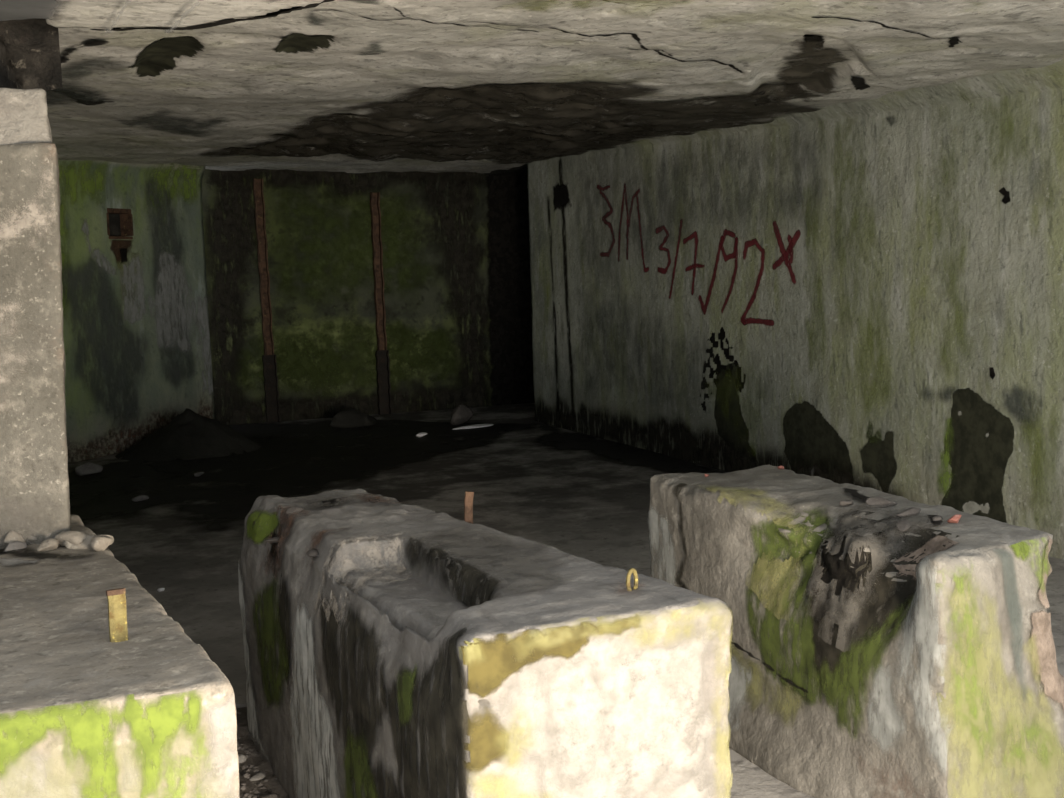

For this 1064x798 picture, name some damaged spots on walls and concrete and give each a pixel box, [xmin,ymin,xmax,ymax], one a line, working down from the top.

crack [90,0,742,73]
crack [811,17,963,47]
corrosion [110,240,132,263]
leakage [64,158,897,531]
leakage [939,388,1032,523]
crack [674,483,689,590]
leakage [193,564,262,798]
crack [730,642,808,693]
spalling [1024,536,1064,709]
leakage [0,751,85,798]